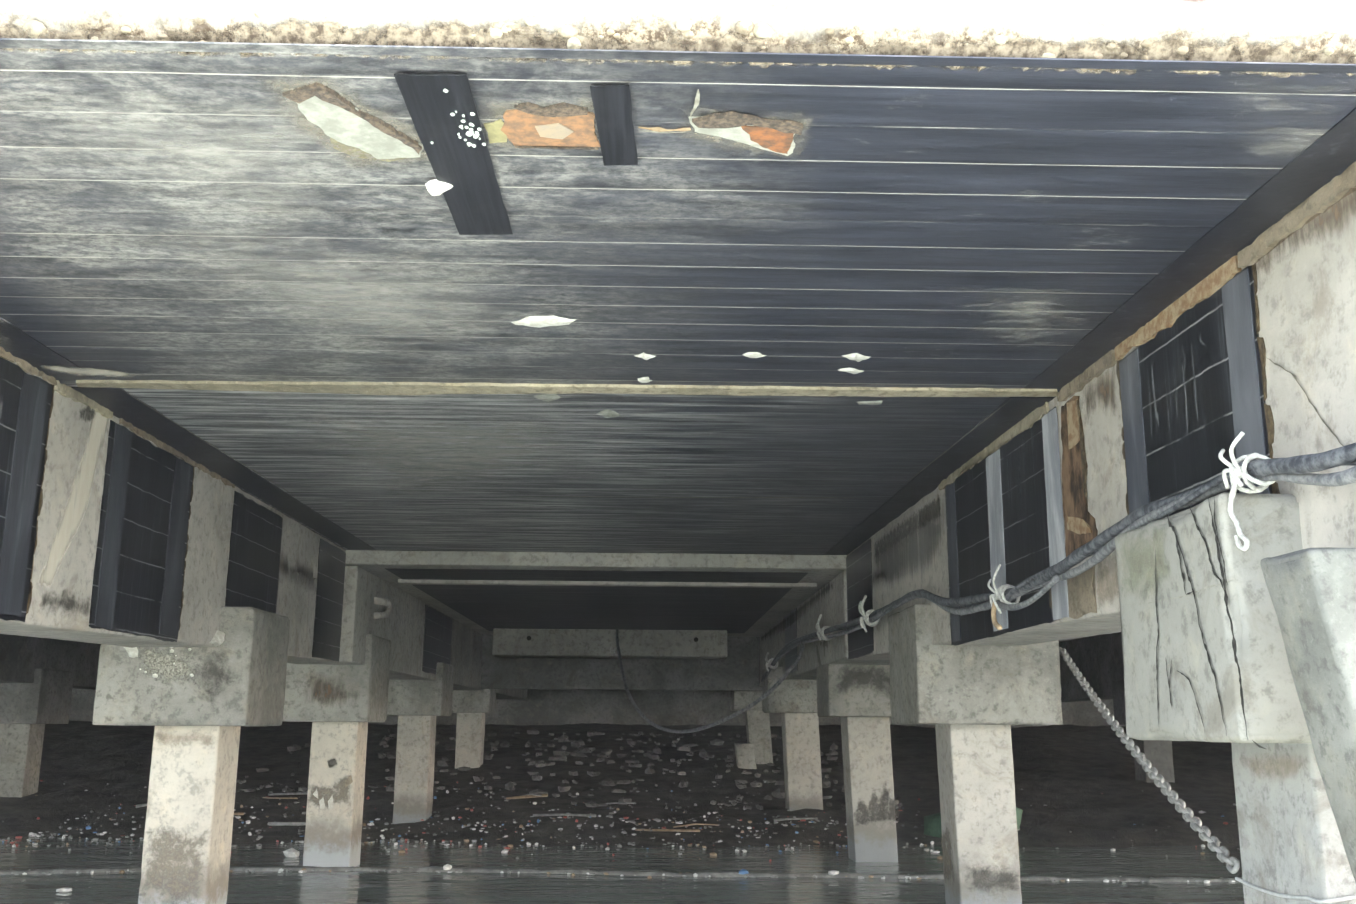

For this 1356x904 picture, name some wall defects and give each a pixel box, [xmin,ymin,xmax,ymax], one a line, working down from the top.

spalling [268,80,426,166]
spalling [484,101,600,150]
spalling [689,111,807,156]
crack [1265,357,1343,446]
crack [1127,498,1266,749]
damp [837,666,890,692]
damp [144,831,205,900]
damp [973,867,1017,891]